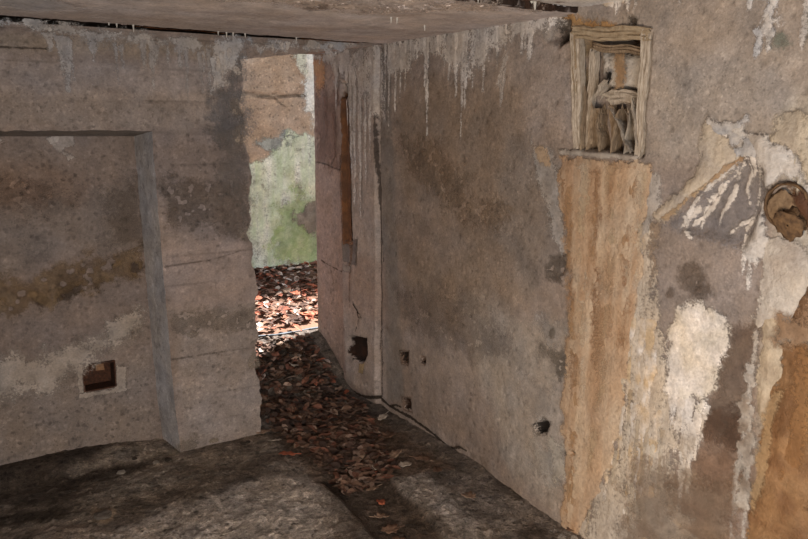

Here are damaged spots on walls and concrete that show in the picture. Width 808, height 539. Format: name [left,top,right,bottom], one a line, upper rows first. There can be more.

water stain [601,0,637,15]
water stain [603,52,640,90]
water stain [752,0,780,59]
water stain [799,0,808,50]
water stain [0,0,567,268]
corrosion [340,92,353,305]
water stain [530,140,640,257]
spalling [671,155,766,249]
water stain [550,109,808,539]